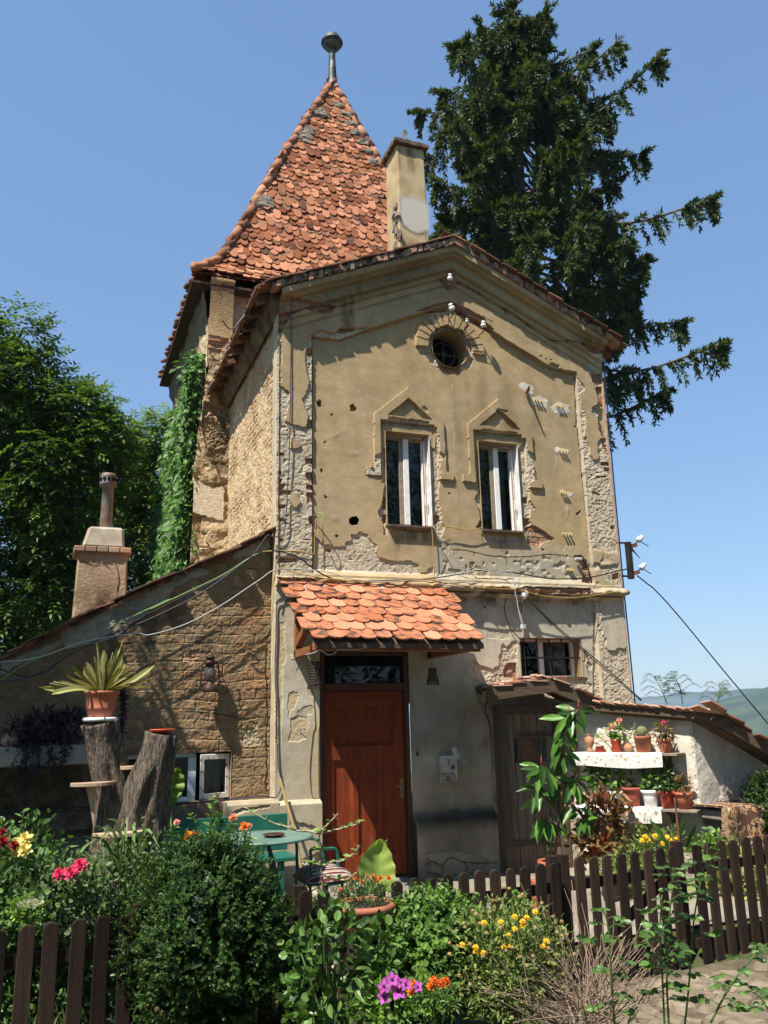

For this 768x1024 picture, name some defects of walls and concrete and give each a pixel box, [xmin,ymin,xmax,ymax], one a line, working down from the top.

flaking render [201,400,229,461]
flaking render [231,292,476,814]
flaking render [477,352,631,703]
flaking render [466,629,518,714]
flaking render [517,693,564,705]